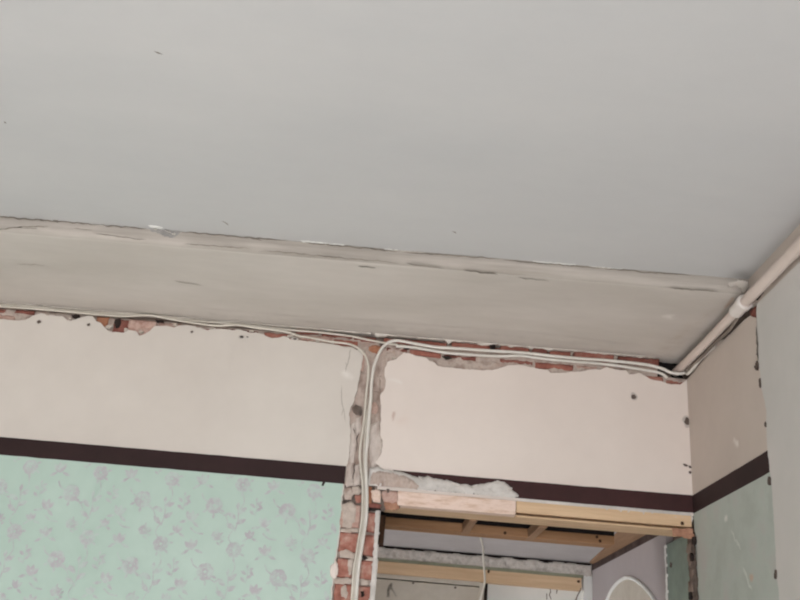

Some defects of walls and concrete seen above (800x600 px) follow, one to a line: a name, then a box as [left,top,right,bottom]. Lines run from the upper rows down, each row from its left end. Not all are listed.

flaking render [0,293,763,416]